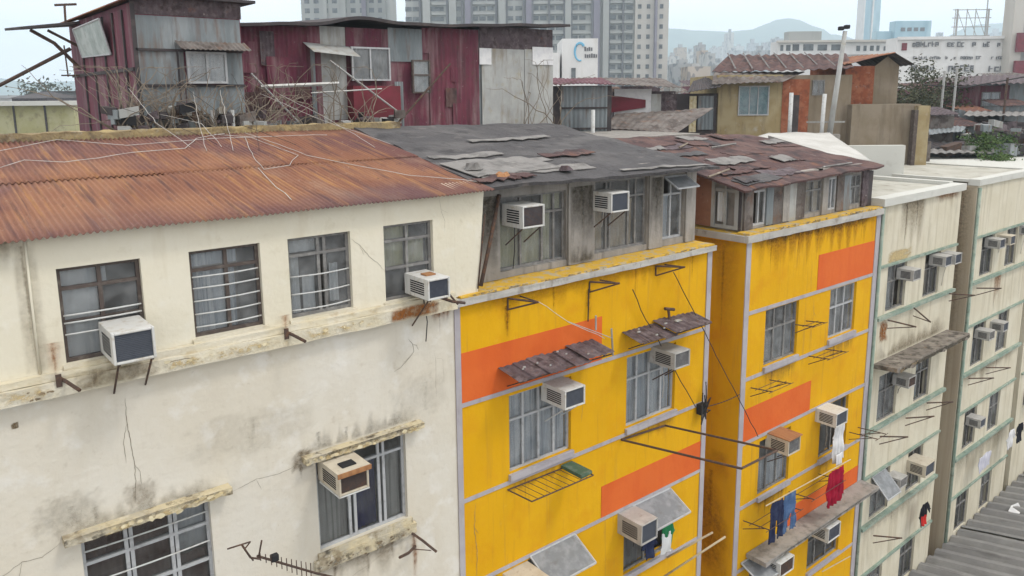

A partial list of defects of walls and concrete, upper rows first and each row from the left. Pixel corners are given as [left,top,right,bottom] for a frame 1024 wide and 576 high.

water stain [482,196,497,232]
corrosion [392,302,448,321]
crack [123,404,142,497]
water stain [294,427,409,469]
peeling [313,427,420,461]
peeling [109,492,223,534]